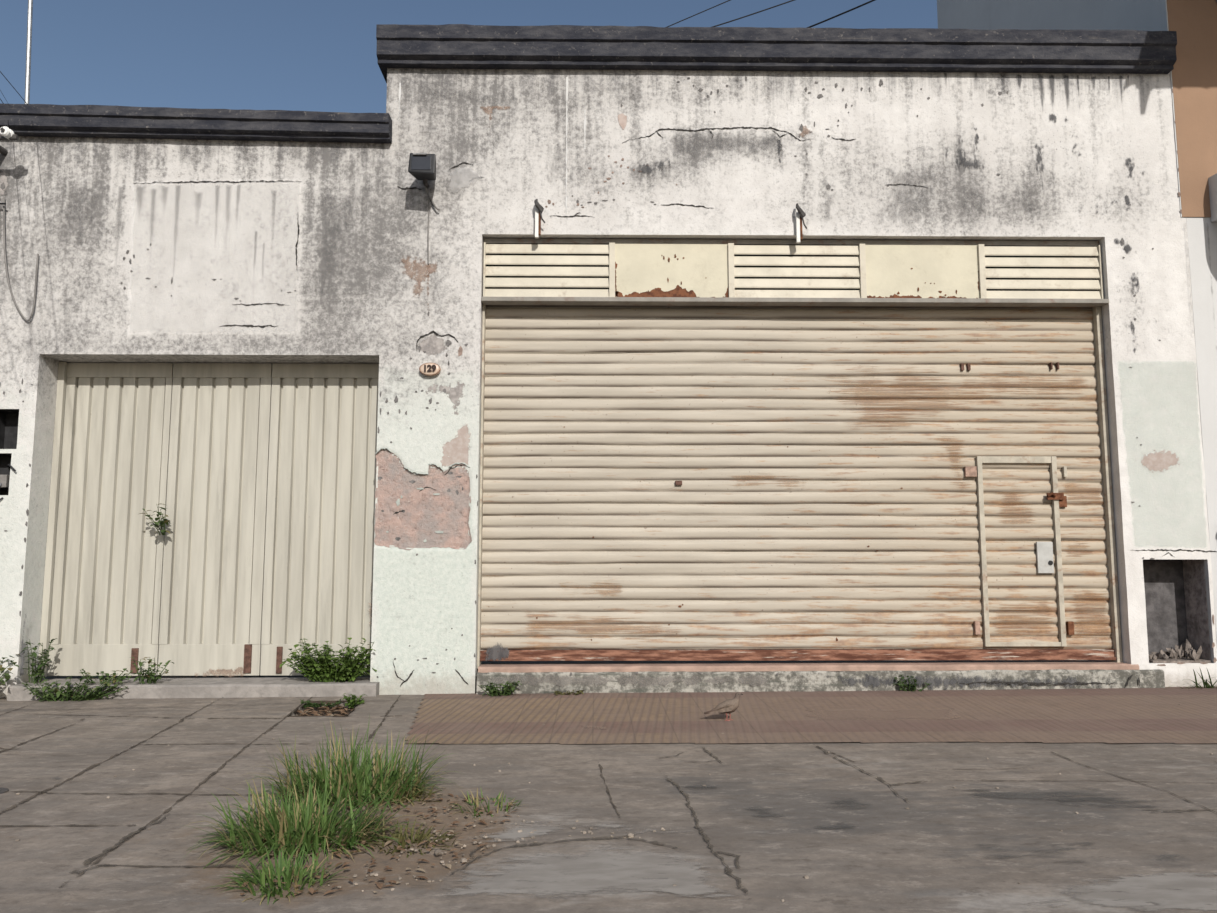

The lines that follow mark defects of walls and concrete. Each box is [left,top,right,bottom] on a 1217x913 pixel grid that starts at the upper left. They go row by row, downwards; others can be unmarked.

water stain [1039,75,1129,122]
water stain [639,161,670,175]
crack [625,127,854,142]
water stain [946,128,1000,176]
rust [615,262,696,297]
spalling [374,330,478,564]
peeling [1136,437,1180,473]